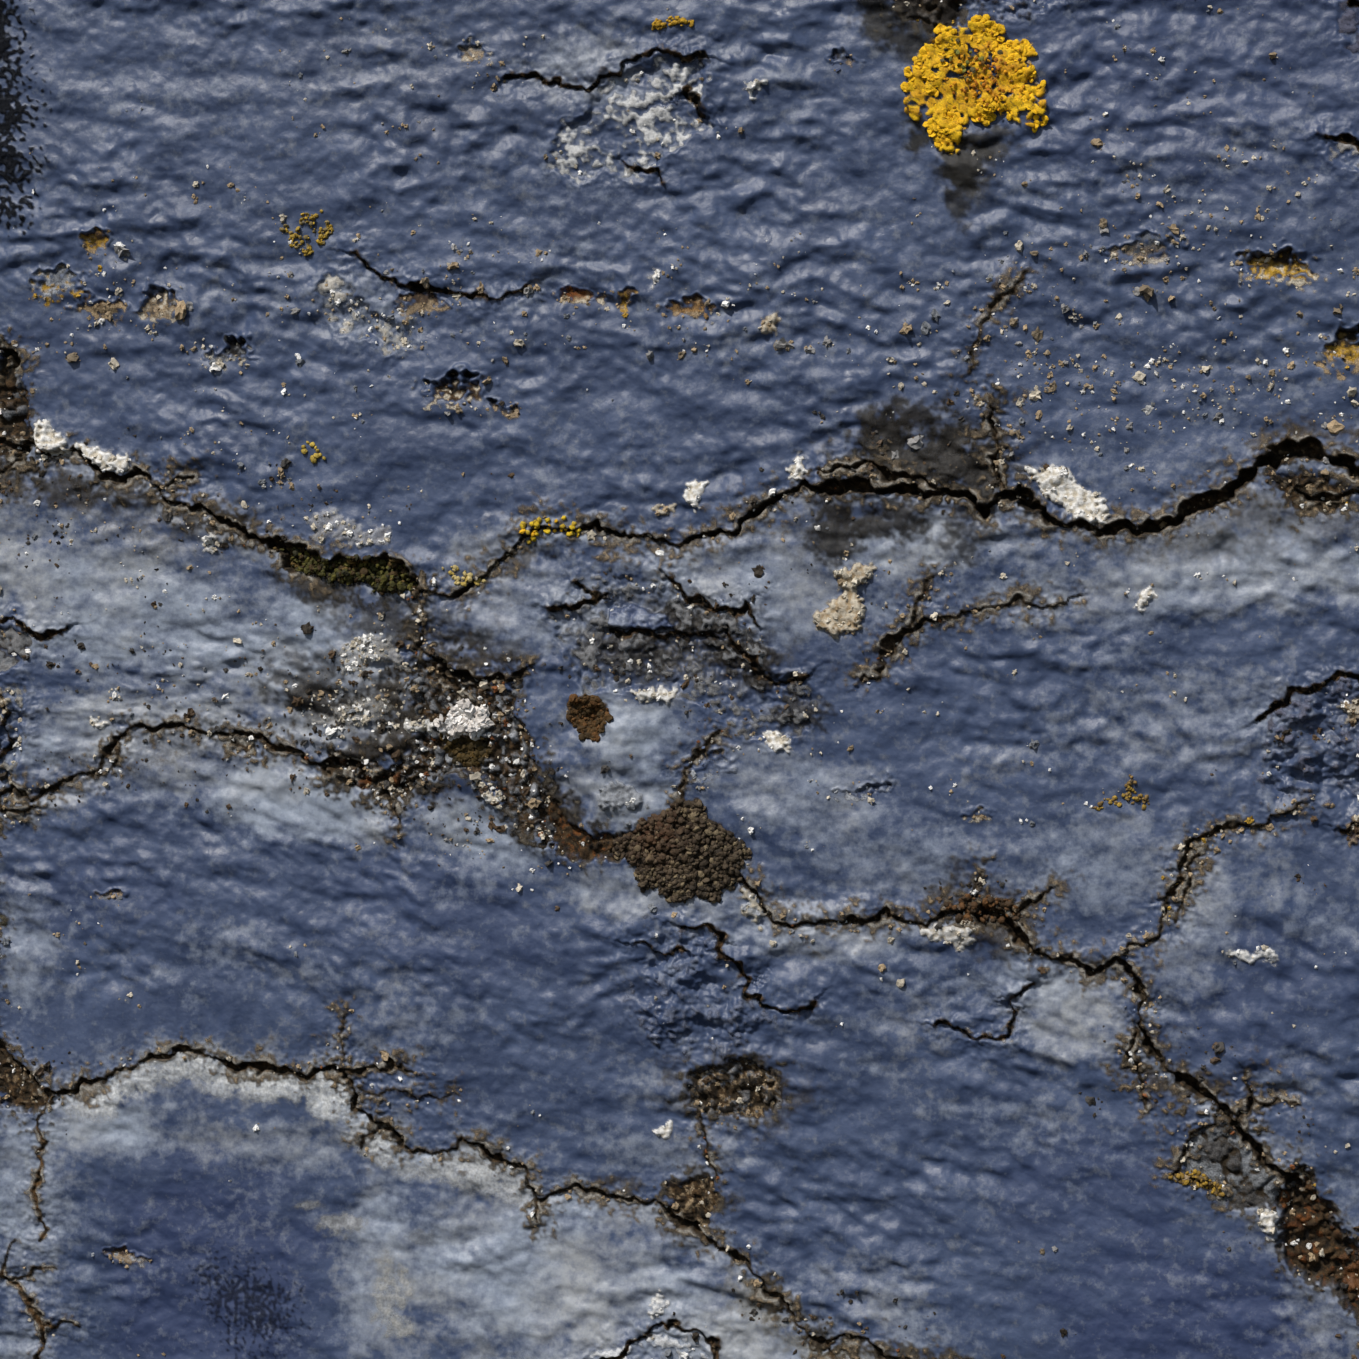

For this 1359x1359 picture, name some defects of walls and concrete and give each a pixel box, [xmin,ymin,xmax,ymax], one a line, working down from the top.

crack [0,267,1359,730]
water stain [807,495,994,639]
water stain [826,383,1110,524]
peeling [0,617,69,774]
crack [0,709,430,848]
crack [665,718,732,804]
crack [736,797,1330,1211]
flaking render [0,1046,53,1133]
crack [0,998,952,1359]